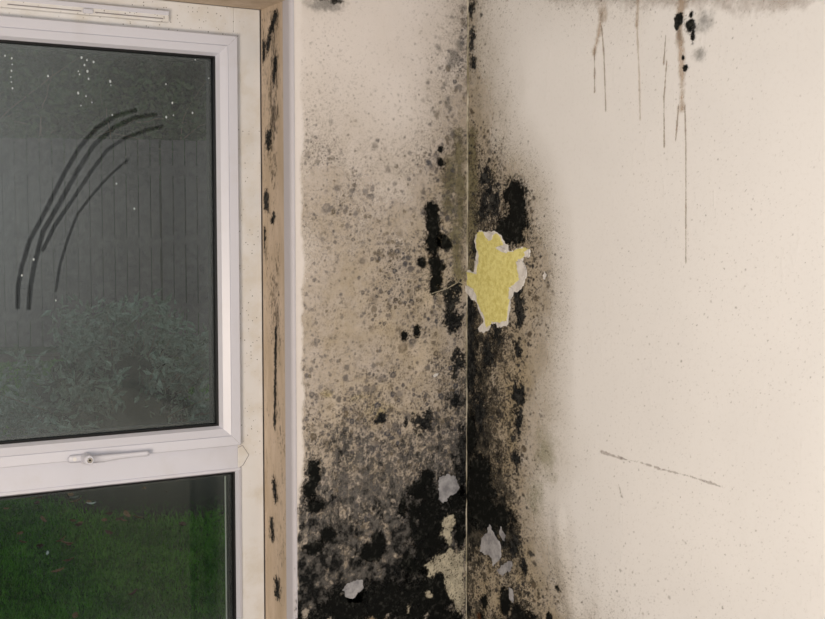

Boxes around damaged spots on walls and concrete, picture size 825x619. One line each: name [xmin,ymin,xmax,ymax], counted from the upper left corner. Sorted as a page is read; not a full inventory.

water stain [674,11,696,41]
water stain [262,10,278,157]
water stain [263,171,277,269]
water stain [297,0,565,619]
peeling [465,230,531,333]
peeling [438,474,460,503]
peeling [342,579,364,599]